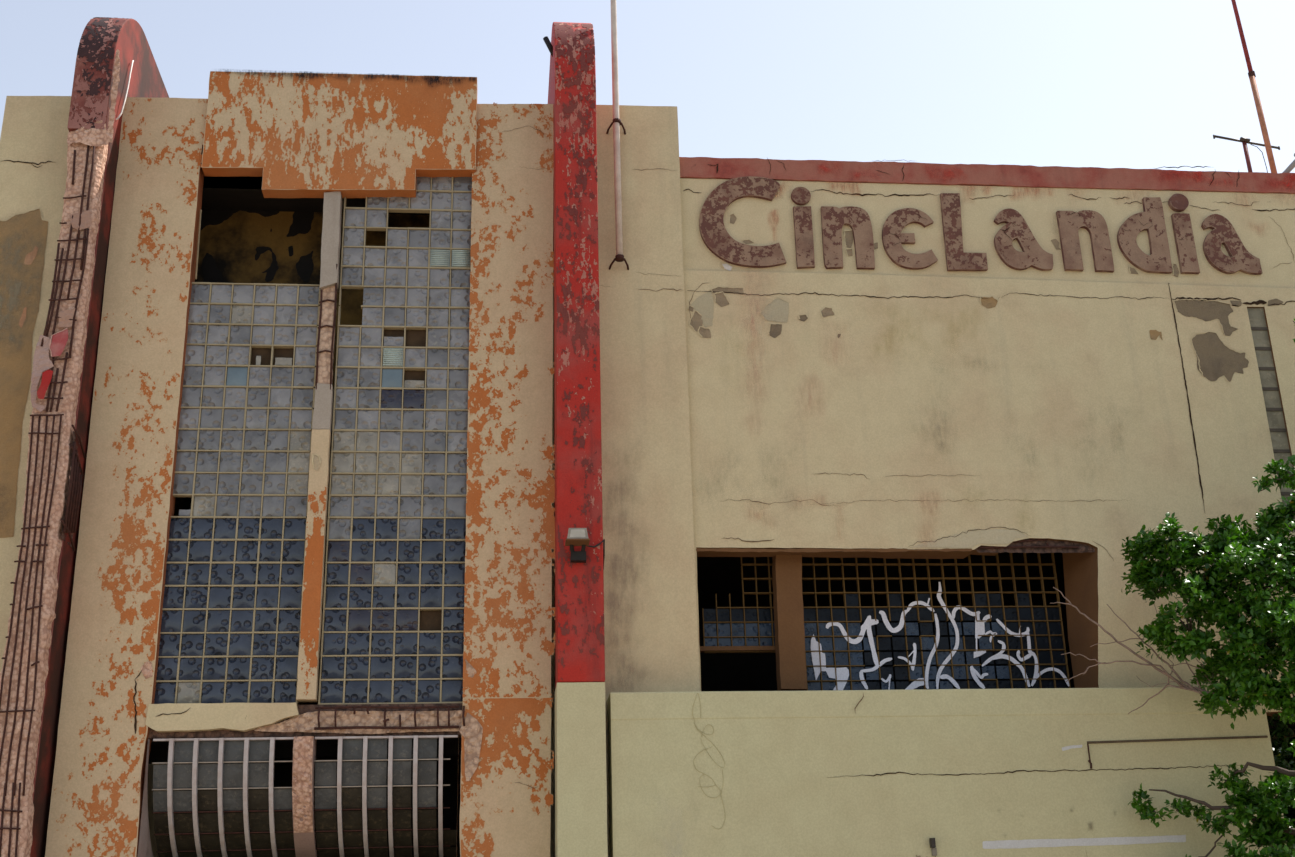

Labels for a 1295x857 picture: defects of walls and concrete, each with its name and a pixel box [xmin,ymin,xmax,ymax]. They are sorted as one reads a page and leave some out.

spalling [798,307,835,321]
spalling [768,323,782,338]
spalling [1174,299,1249,384]
crack [599,272,1295,511]
crack [727,473,1128,546]
spalling [696,539,1095,553]
crack [828,765,1245,778]